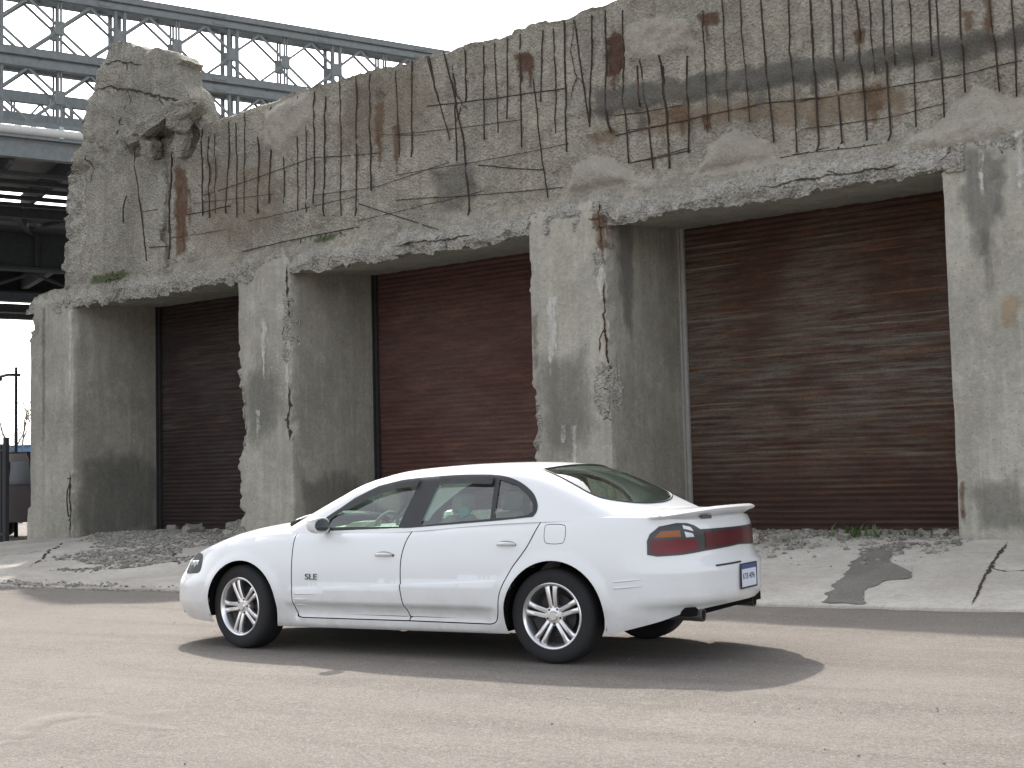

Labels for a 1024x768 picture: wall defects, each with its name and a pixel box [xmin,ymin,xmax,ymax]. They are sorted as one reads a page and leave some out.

crack [96,60,179,134]
corrosion [515,52,534,87]
spalling [116,0,1022,261]
corrosion [607,33,623,88]
damp [594,26,1024,128]
corrosion [174,169,192,254]
crack [759,164,897,187]
crack [599,285,612,420]
crack [285,387,293,440]
spalling [593,361,624,421]
crack [19,477,71,568]
crack [972,543,1024,604]